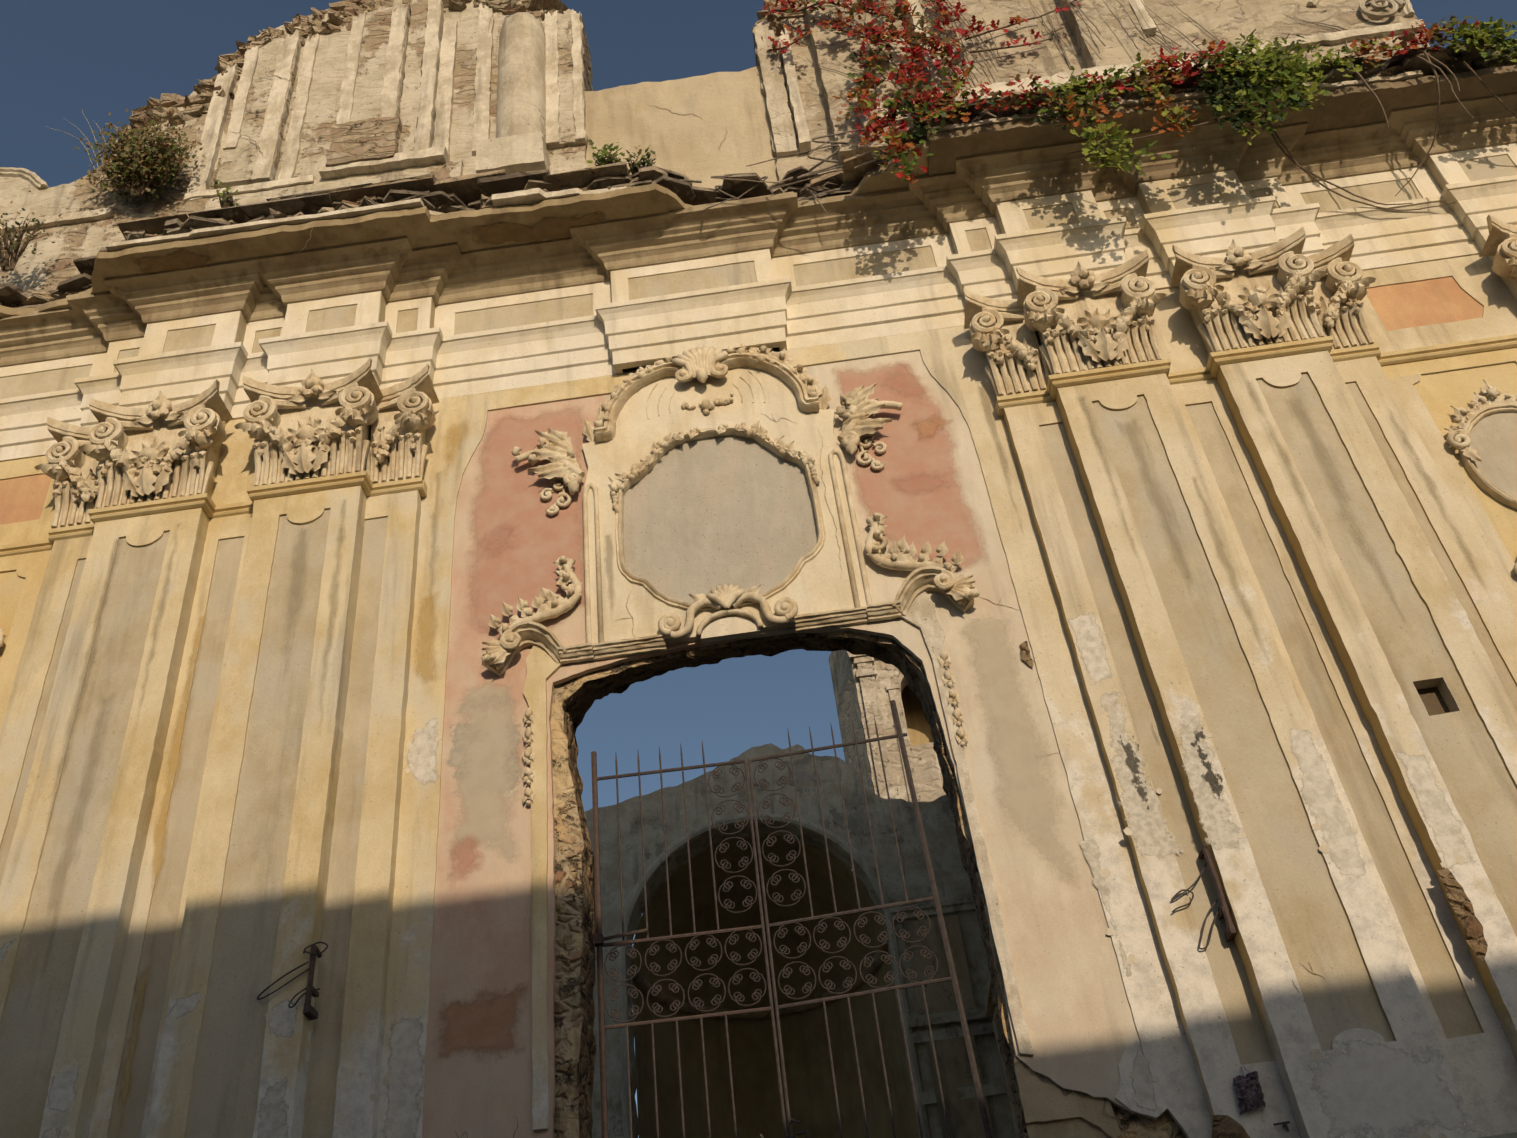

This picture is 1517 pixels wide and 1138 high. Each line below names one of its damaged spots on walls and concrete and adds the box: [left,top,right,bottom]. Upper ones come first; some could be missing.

damp [154,617,204,876]
flaking render [403,718,477,783]
flaking render [1067,613,1183,859]
flaking render [1176,716,1246,850]
flaking render [1290,729,1365,876]